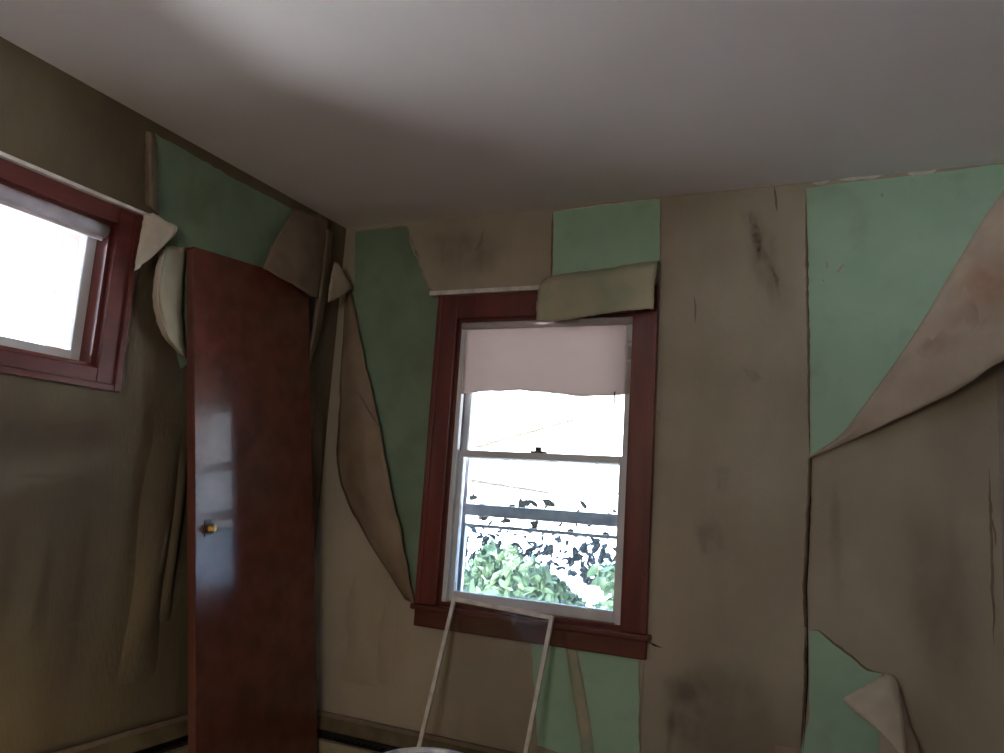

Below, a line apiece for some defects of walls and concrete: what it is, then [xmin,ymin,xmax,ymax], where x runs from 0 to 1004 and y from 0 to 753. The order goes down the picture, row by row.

flaking render [155,134,293,368]
flaking render [353,226,438,599]
flaking render [805,164,1004,455]
flaking render [531,643,640,753]
flaking render [801,630,882,753]